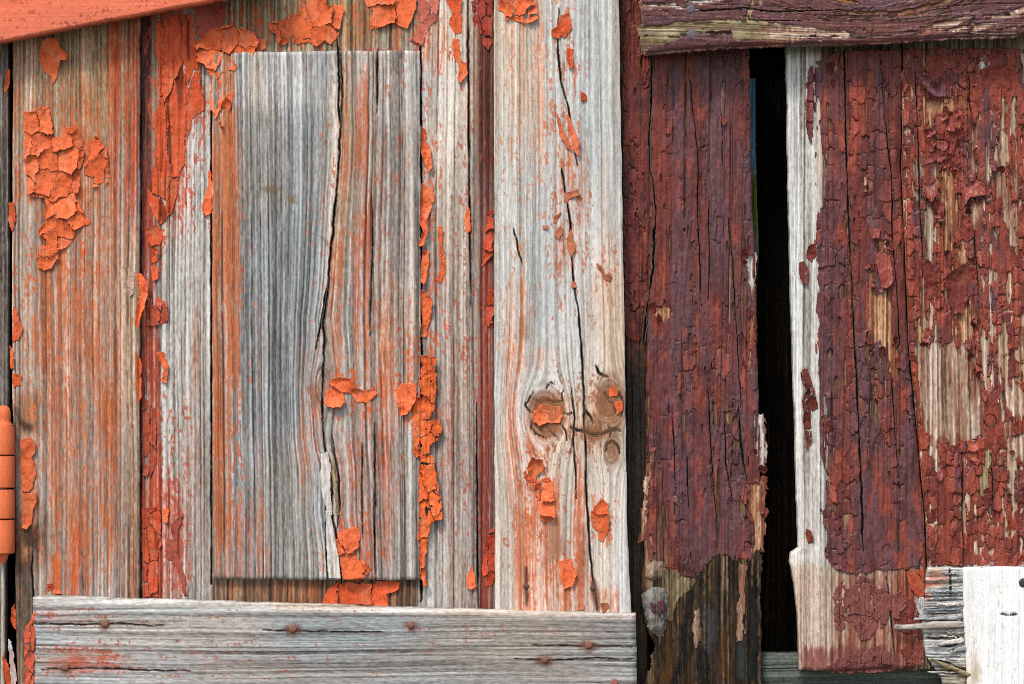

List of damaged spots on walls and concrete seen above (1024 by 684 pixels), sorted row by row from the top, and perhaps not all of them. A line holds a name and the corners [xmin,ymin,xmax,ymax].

peeling [22,107,111,271]
peeling [126,0,345,327]
crack [316,38,377,584]
peeling [396,355,443,587]
peeling [365,0,538,83]
crack [557,9,571,119]
crack [561,153,578,232]
crack [524,257,624,611]
crack [642,55,657,343]
crack [672,67,748,543]
peeling [747,412,769,554]
peeling [864,69,1024,541]